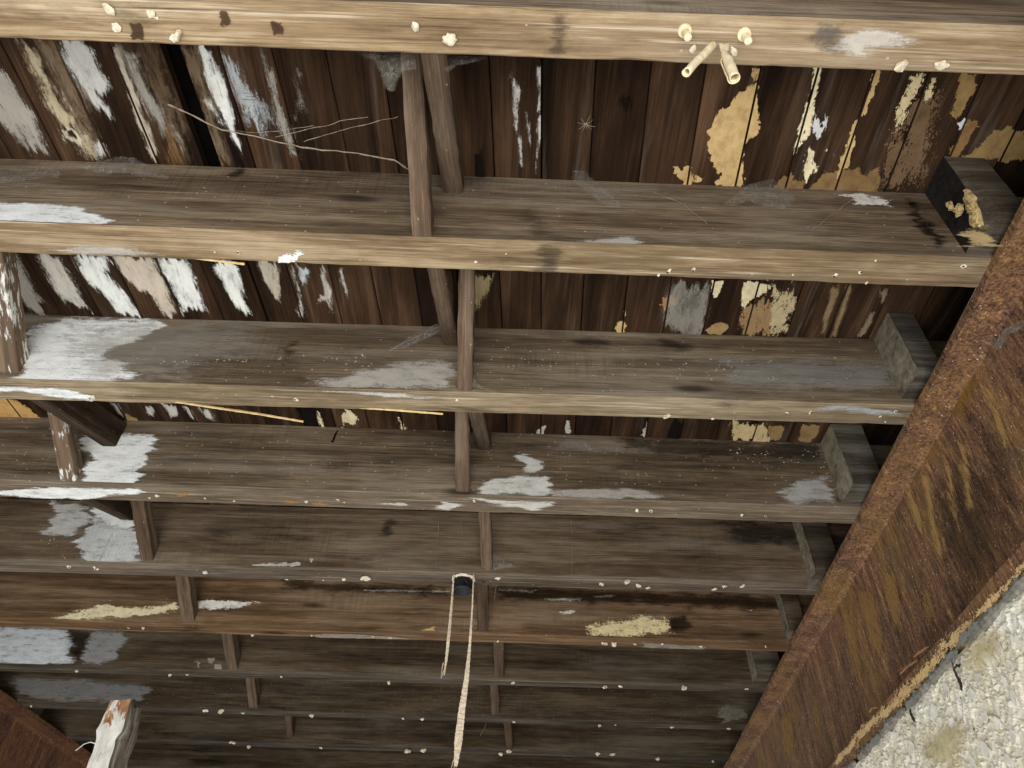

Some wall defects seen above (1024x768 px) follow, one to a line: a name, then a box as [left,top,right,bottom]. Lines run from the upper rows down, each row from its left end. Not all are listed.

peeling [924,77,936,103]
peeling [809,167,881,192]